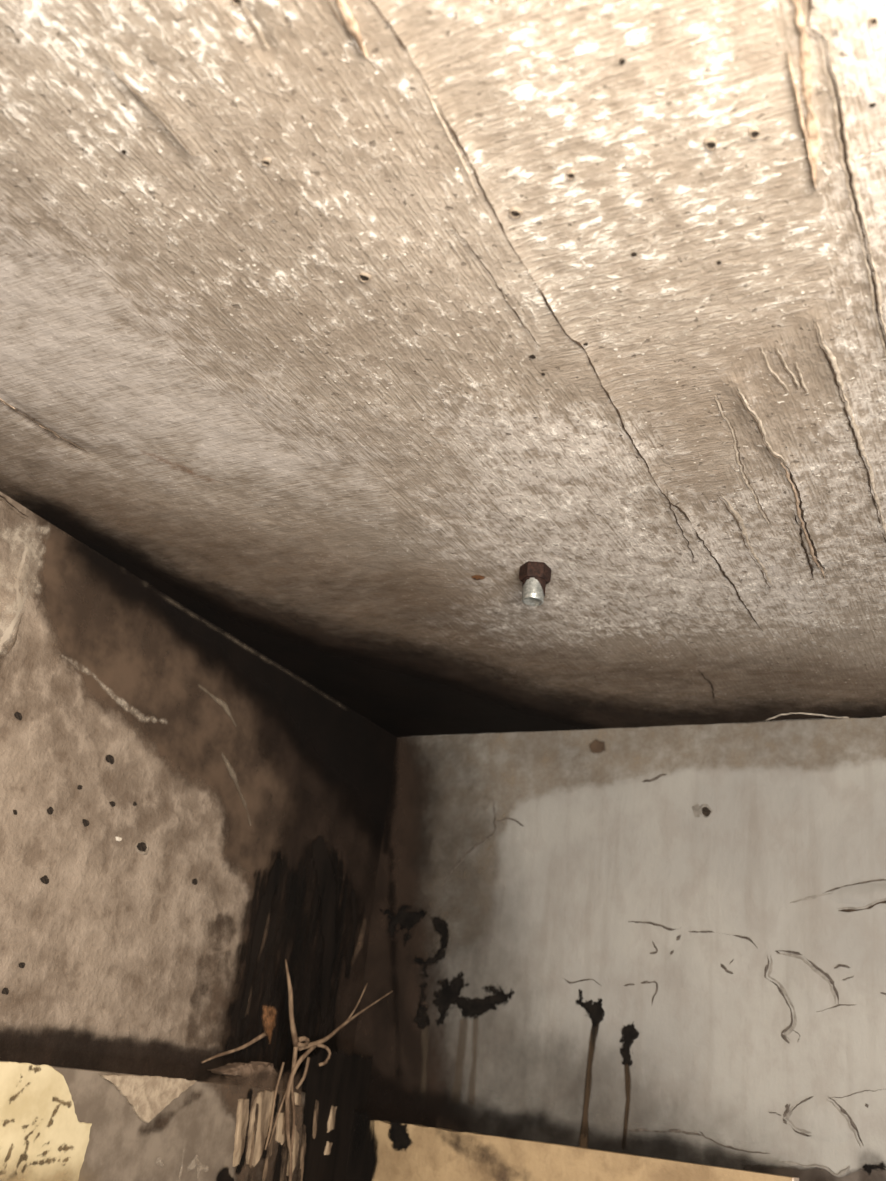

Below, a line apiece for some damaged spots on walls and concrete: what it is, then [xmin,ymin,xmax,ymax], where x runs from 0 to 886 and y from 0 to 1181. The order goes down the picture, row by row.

crack [327,0,361,56]
crack [803,0,886,357]
crack [370,0,763,631]
crack [714,389,827,587]
crack [758,318,886,541]
rust [522,577,546,597]
damp [0,509,886,1181]
crack [790,879,886,912]
crack [566,921,854,1044]
crack [627,1128,770,1154]
crack [769,1089,883,1147]